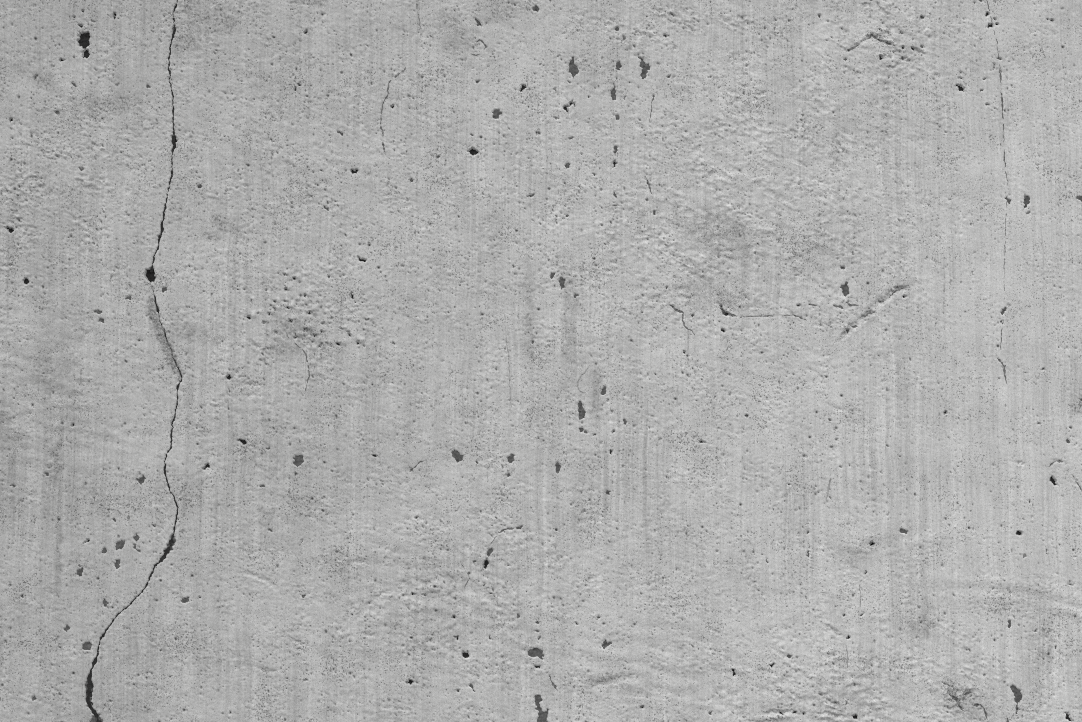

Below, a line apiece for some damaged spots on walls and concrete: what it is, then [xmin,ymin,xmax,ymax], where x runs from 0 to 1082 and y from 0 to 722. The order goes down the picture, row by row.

crack [85,0,182,722]